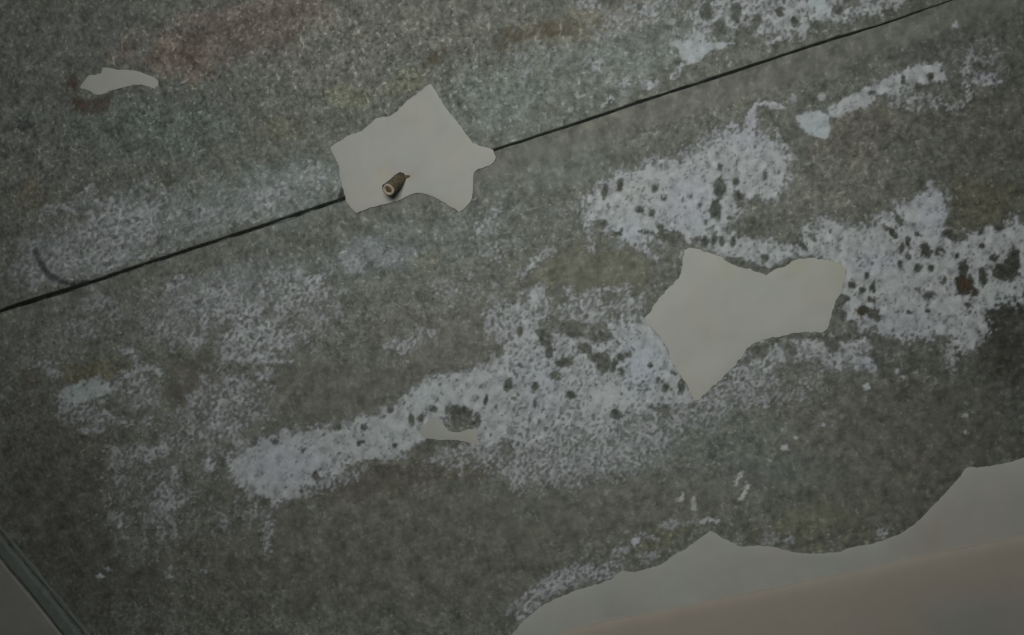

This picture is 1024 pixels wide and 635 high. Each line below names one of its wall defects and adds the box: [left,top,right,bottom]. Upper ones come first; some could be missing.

flaking render [80,68,159,95]
flaking render [330,84,496,213]
crack [493,0,951,151]
water stain [576,0,905,108]
water stain [796,39,1003,140]
crack [0,190,346,312]
water stain [55,93,1024,578]
flaking render [645,248,846,400]
flaking render [419,418,481,445]
water stain [505,492,720,623]
peeling [511,457,1024,635]